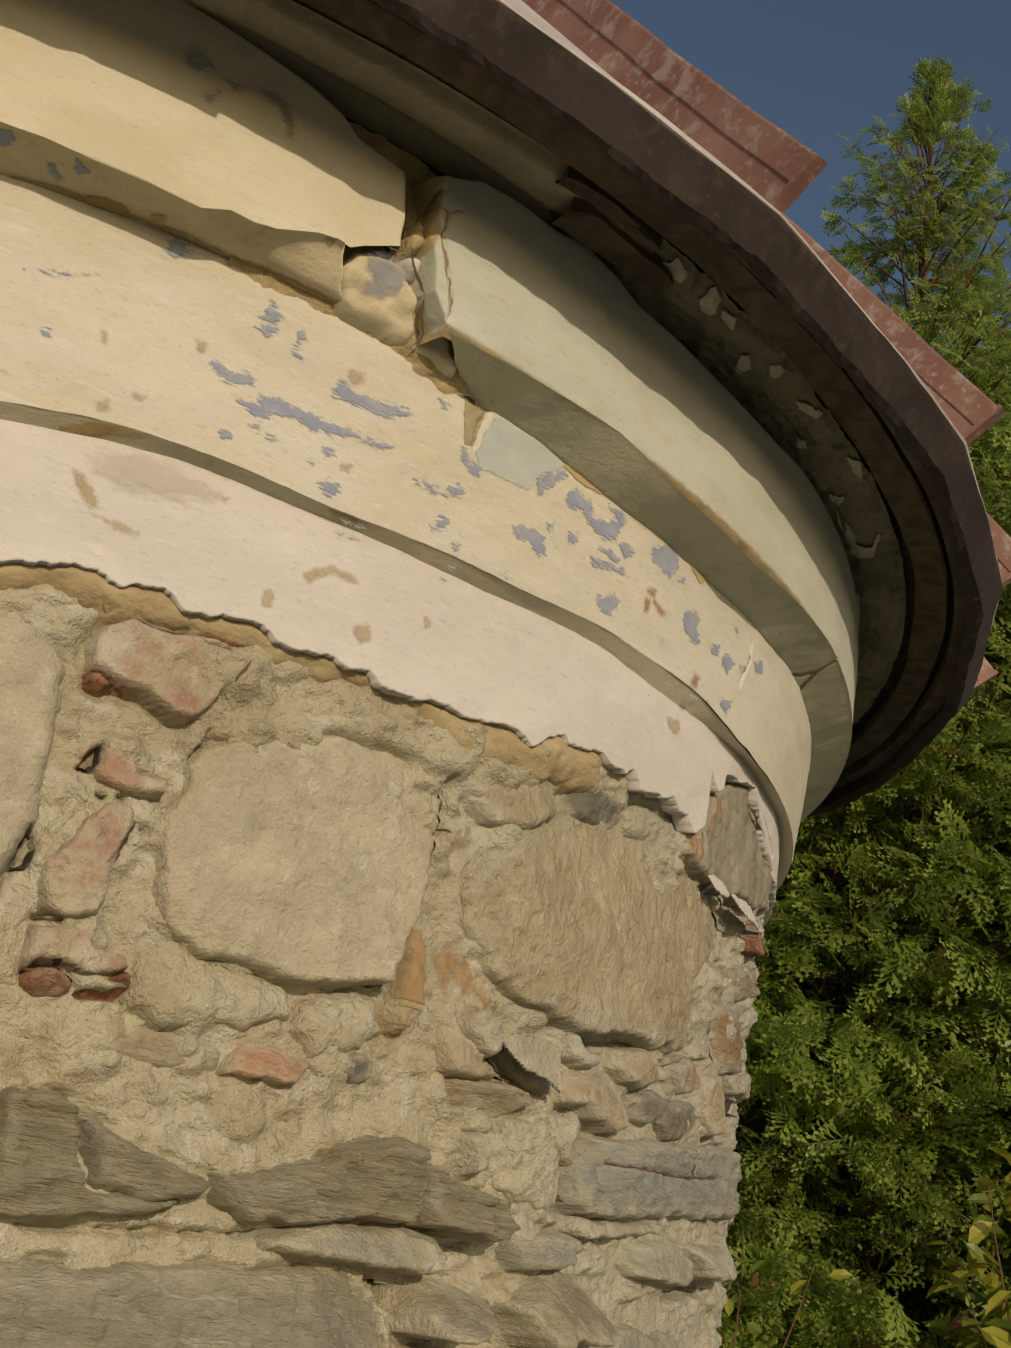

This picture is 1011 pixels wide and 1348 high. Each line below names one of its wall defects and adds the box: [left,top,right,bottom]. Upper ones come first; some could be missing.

peeling [254,299,285,337]
crack [387,189,465,346]
peeling [662,258,688,283]
peeling [699,287,737,331]
peeling [208,359,394,466]
peeling [317,476,341,497]
peeling [330,376,412,420]
spalling [413,397,485,498]
peeling [512,464,706,584]
spalling [0,563,602,796]
peeling [683,610,763,675]
peeling [681,783,772,938]